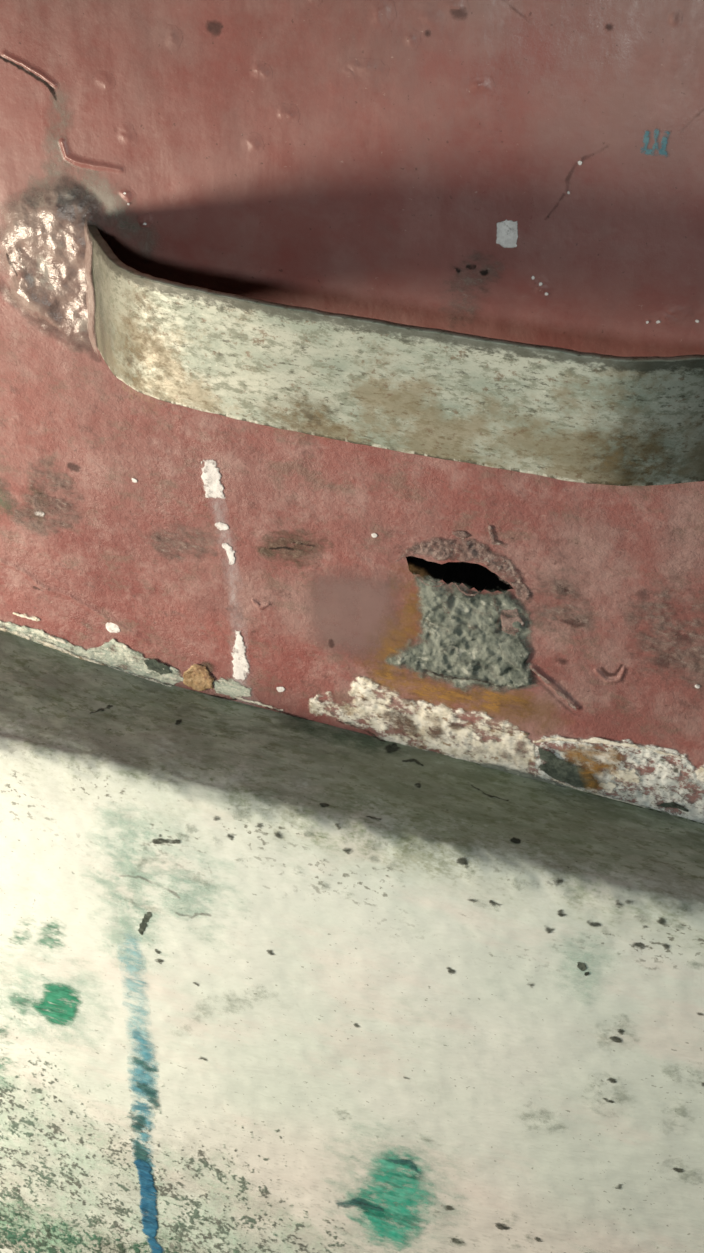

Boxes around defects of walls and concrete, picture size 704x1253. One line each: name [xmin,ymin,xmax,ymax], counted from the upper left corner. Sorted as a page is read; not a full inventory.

flaking render [386,526,535,692]
rust [376,665,529,712]
peeling [309,677,704,823]